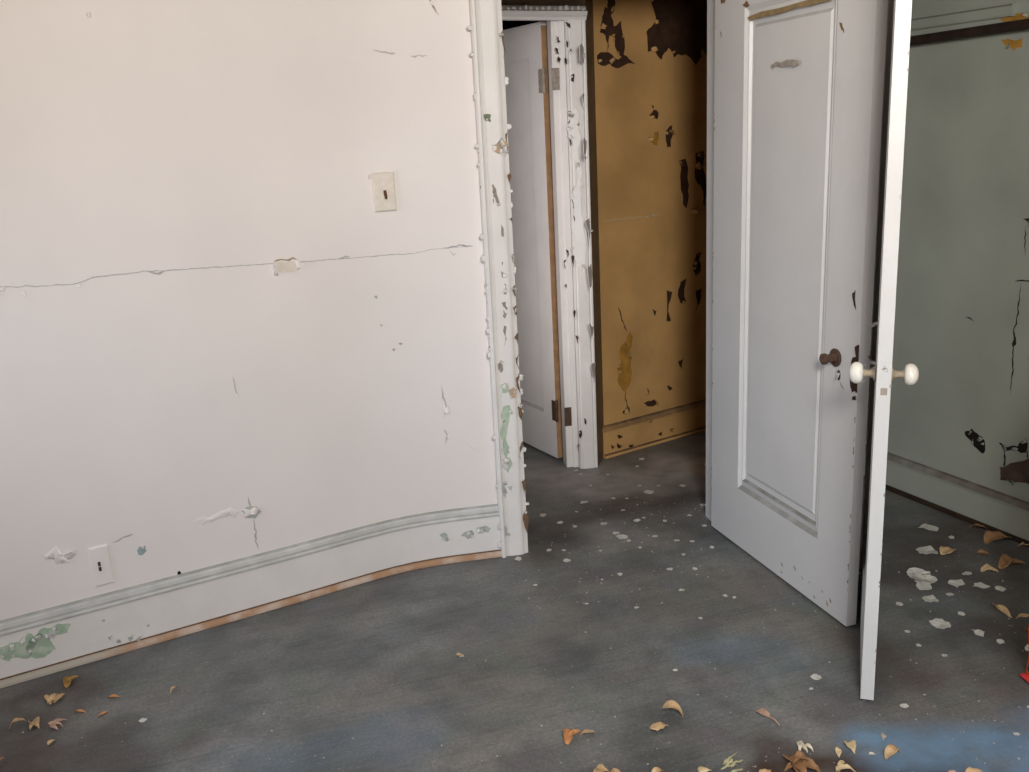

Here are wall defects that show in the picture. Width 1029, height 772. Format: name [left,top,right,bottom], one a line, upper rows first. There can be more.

peeling [501,0,635,82]
peeling [647,0,707,65]
peeling [648,105,676,147]
peeling [678,151,707,214]
crack [0,263,273,297]
crack [301,244,472,262]
peeling [653,252,714,321]
crack [1010,280,1029,393]
peeling [492,355,529,531]
spalling [965,429,985,454]
peeling [998,438,1029,486]
peeling [0,623,71,662]